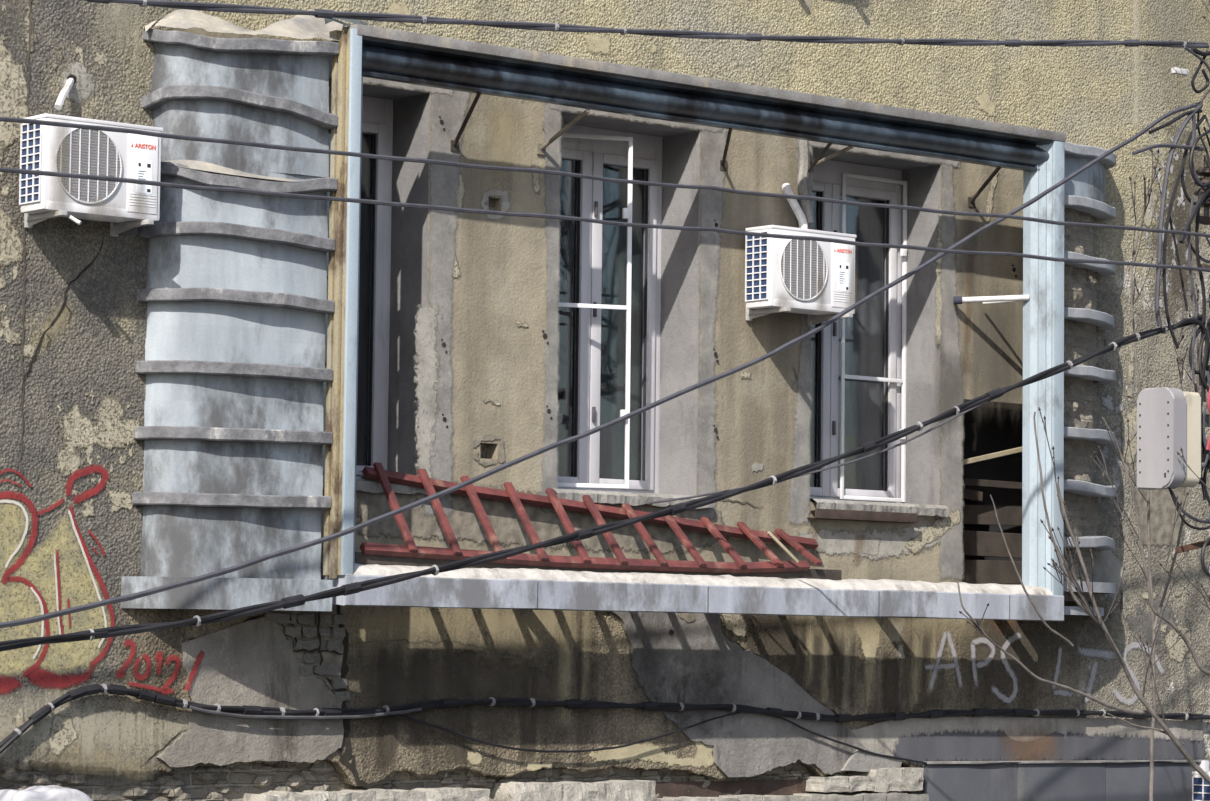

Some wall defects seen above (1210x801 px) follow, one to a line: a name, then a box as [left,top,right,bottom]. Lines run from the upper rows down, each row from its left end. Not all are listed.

crack [25,0,33,117]
peeling [0,0,107,290]
peeling [0,303,37,361]
crack [19,225,104,496]
peeling [52,386,143,519]
spalling [263,604,351,702]
leakage [346,606,593,767]
peeling [722,614,746,637]
leakage [745,601,1105,712]
flaking render [0,697,858,801]